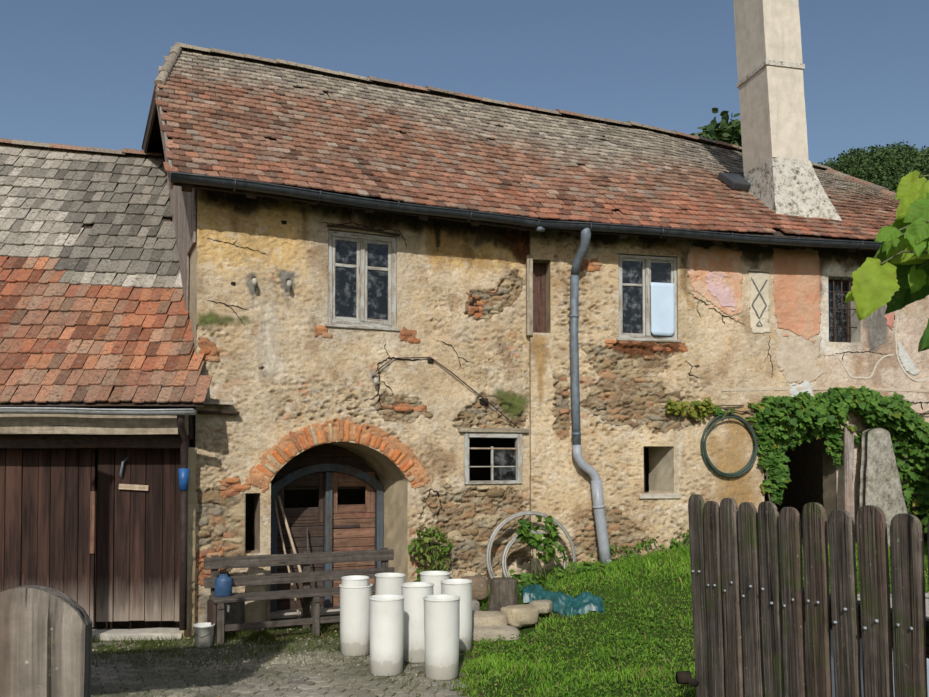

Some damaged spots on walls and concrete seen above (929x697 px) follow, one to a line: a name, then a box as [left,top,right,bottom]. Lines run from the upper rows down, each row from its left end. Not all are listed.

crack [207,300,249,324]
flaking render [464,269,523,321]
crack [690,293,745,325]
peeling [773,248,824,397]
crack [370,340,473,416]
flaking render [552,339,704,440]
flaking render [195,391,529,586]
flaking render [569,506,653,562]